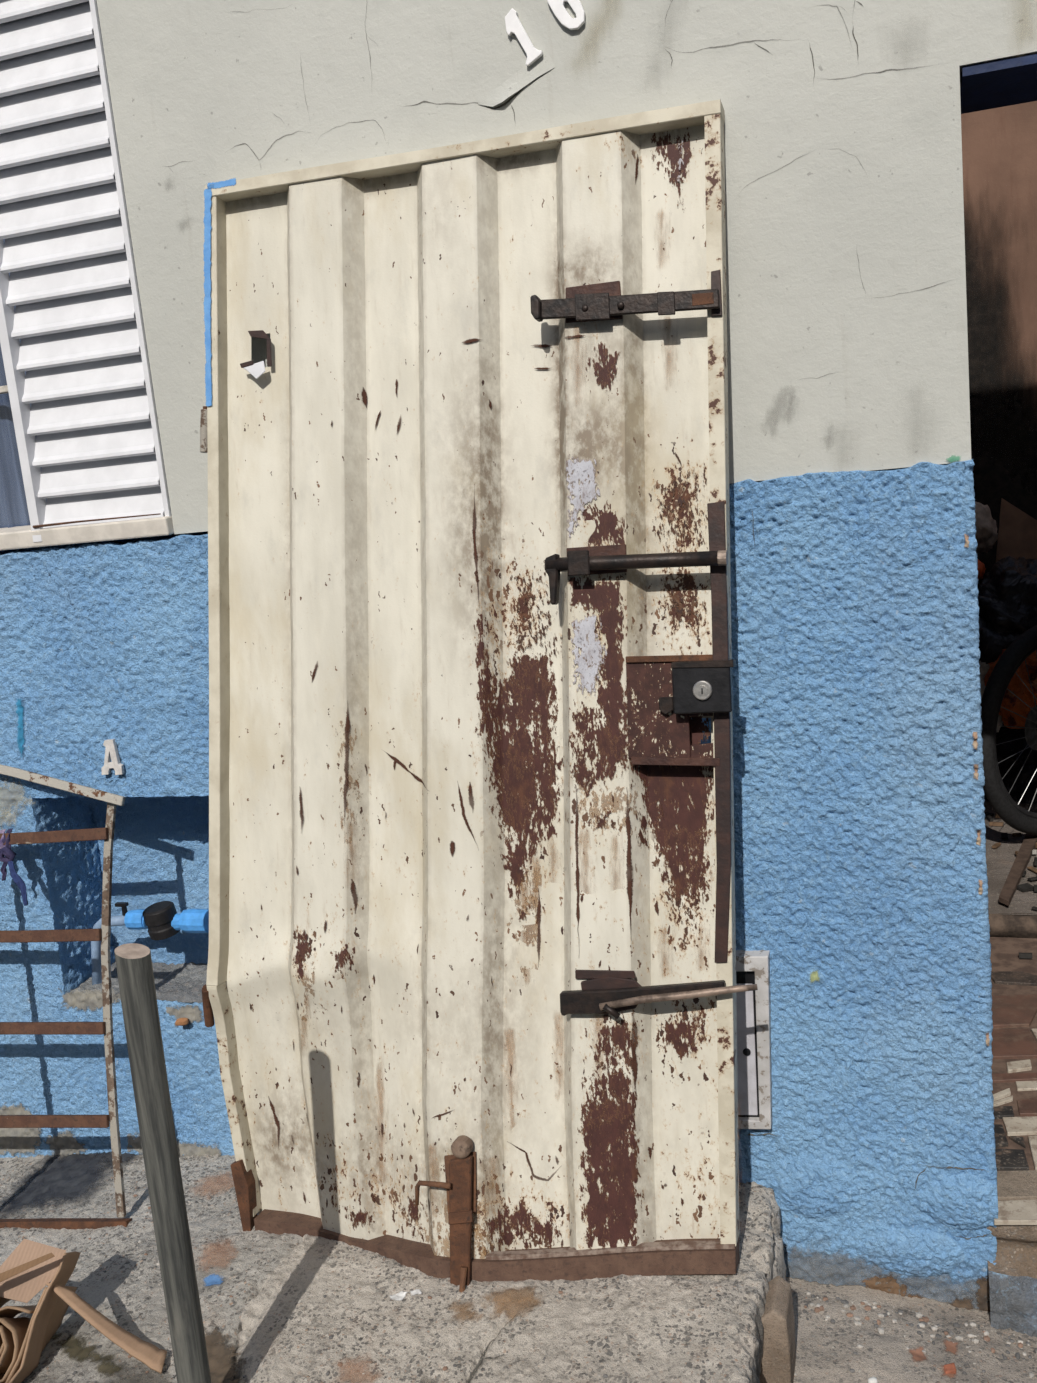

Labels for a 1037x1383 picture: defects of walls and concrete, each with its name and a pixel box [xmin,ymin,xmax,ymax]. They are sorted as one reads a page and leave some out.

crack [667,1,902,79]
crack [409,99,477,107]
peeling [471,52,555,109]
crack [468,1318,514,1383]